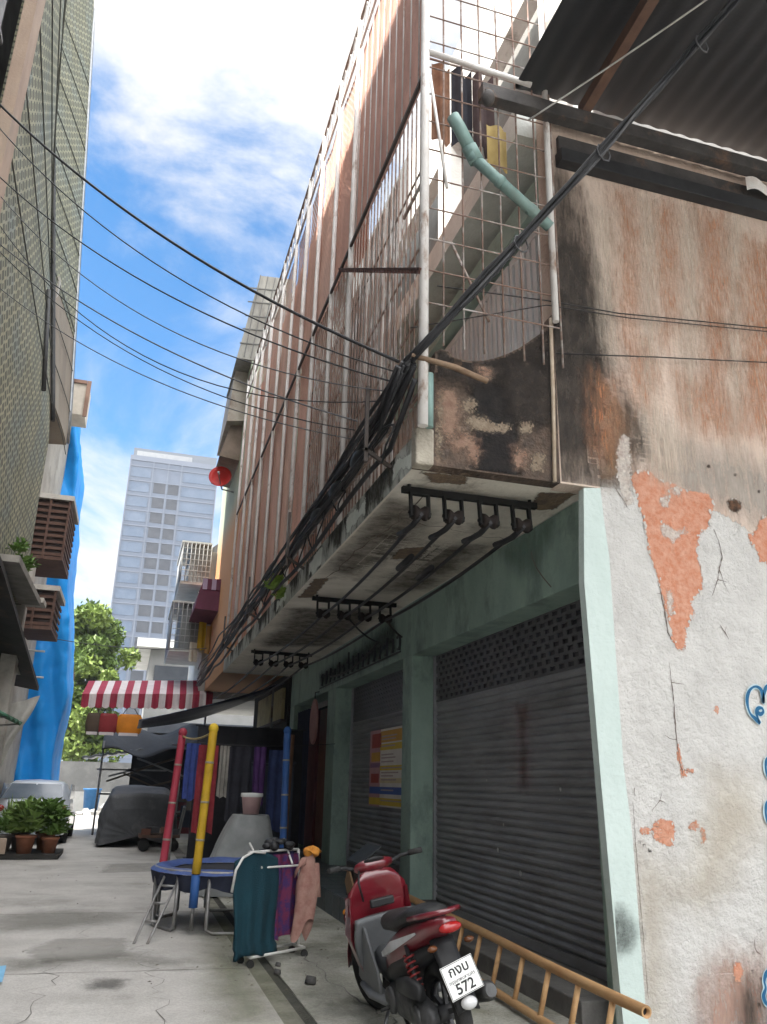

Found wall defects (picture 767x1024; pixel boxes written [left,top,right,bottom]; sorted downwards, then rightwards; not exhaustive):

damp [435,170,767,515]
rust [677,215,767,433]
damp [391,547,483,591]
peeling [616,470,742,651]
crack [712,529,728,596]
peeling [748,515,767,564]
crack [665,663,692,774]
peeling [640,819,675,847]
peeling [688,820,707,846]